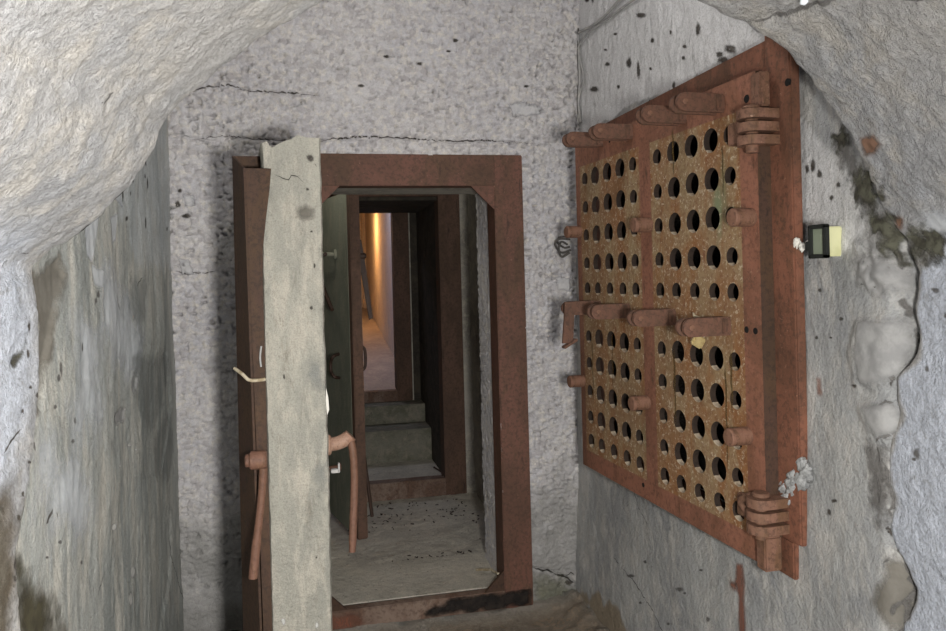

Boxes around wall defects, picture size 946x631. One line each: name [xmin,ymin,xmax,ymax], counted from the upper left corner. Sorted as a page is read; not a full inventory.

crack [757,0,832,21]
crack [196,84,309,95]
water stain [831,126,849,155]
spalling [835,136,902,228]
water stain [853,167,946,267]
water stain [32,255,67,371]
peeling [85,219,142,394]
spalling [854,239,915,317]
spalling [866,446,895,535]
water stain [0,505,50,631]
rust [730,565,745,631]
flaking render [890,564,917,631]